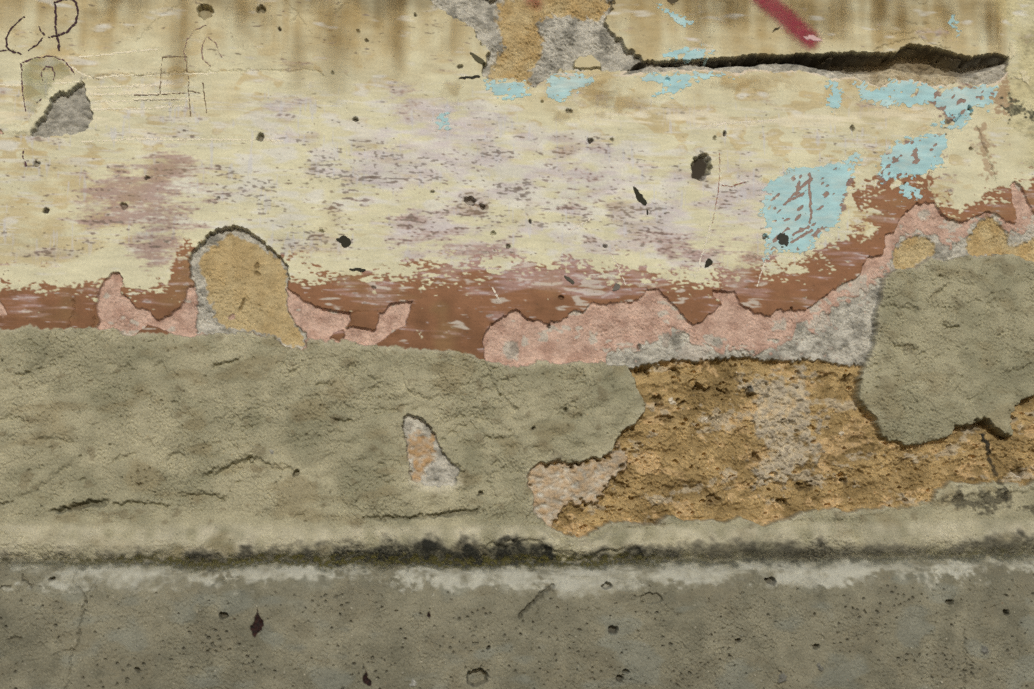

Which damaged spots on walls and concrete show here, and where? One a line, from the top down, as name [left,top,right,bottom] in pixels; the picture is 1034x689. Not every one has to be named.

spalling [0,80,93,138]
spalling [91,226,416,350]
spalling [431,0,1034,538]
spalling [403,414,459,487]